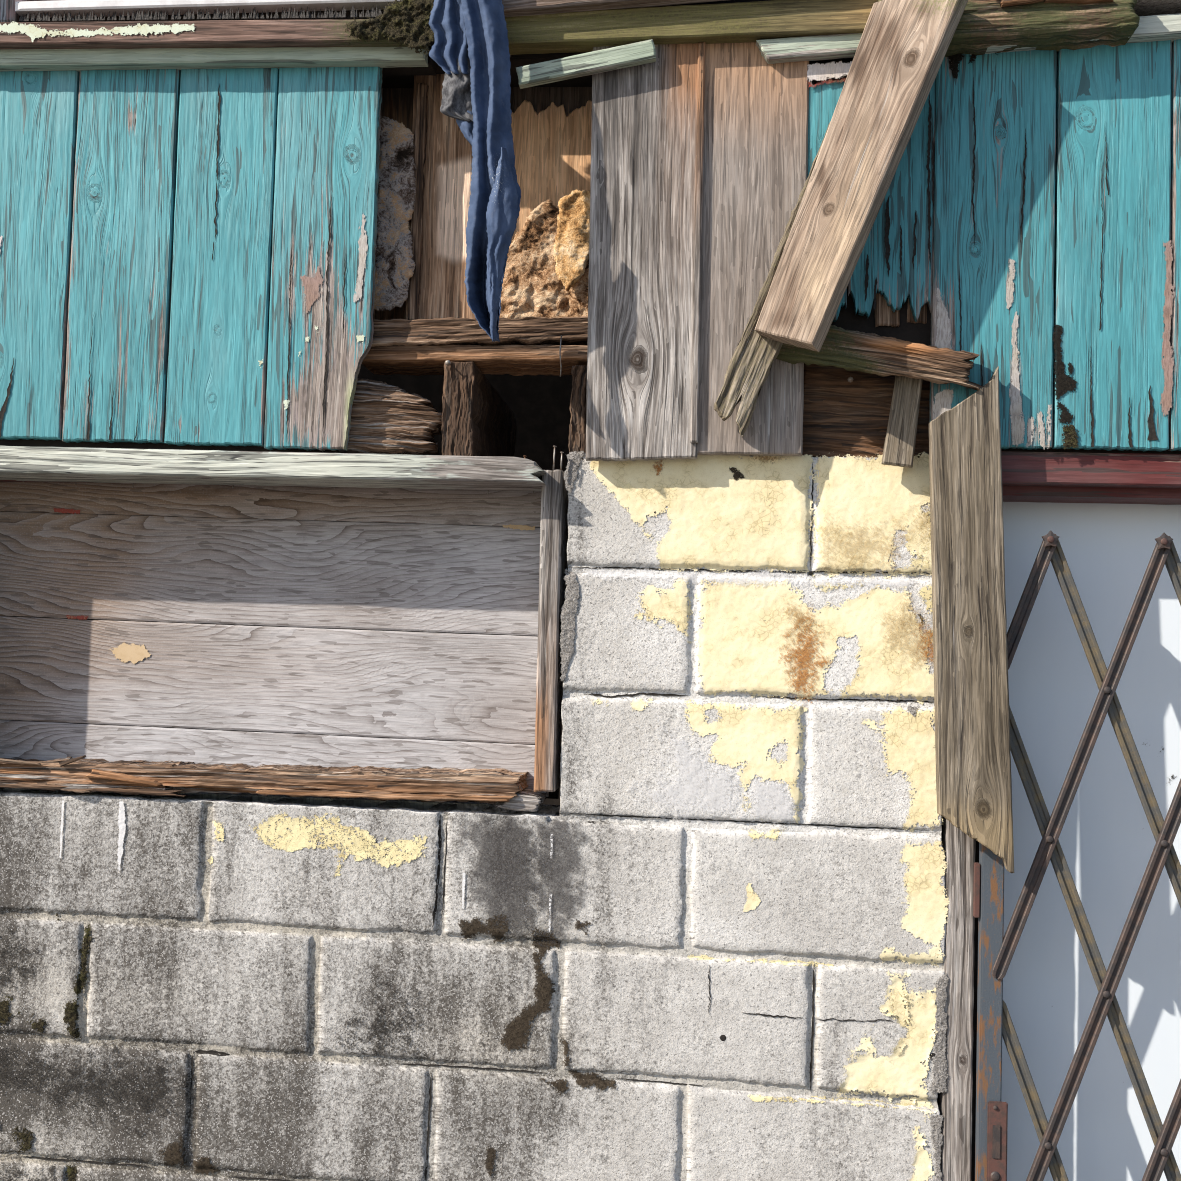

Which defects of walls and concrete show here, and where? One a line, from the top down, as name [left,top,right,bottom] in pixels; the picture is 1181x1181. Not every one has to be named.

peeling [300,266,324,313]
peeling [353,214,369,302]
peeling [1006,259,1052,449]
spalling [559,569,580,681]
rust [779,609,831,703]
peeling [213,821,225,842]
peeling [248,811,427,877]
peeling [563,451,950,1181]
leakage [458,806,591,1051]
leakage [539,1038,617,1095]